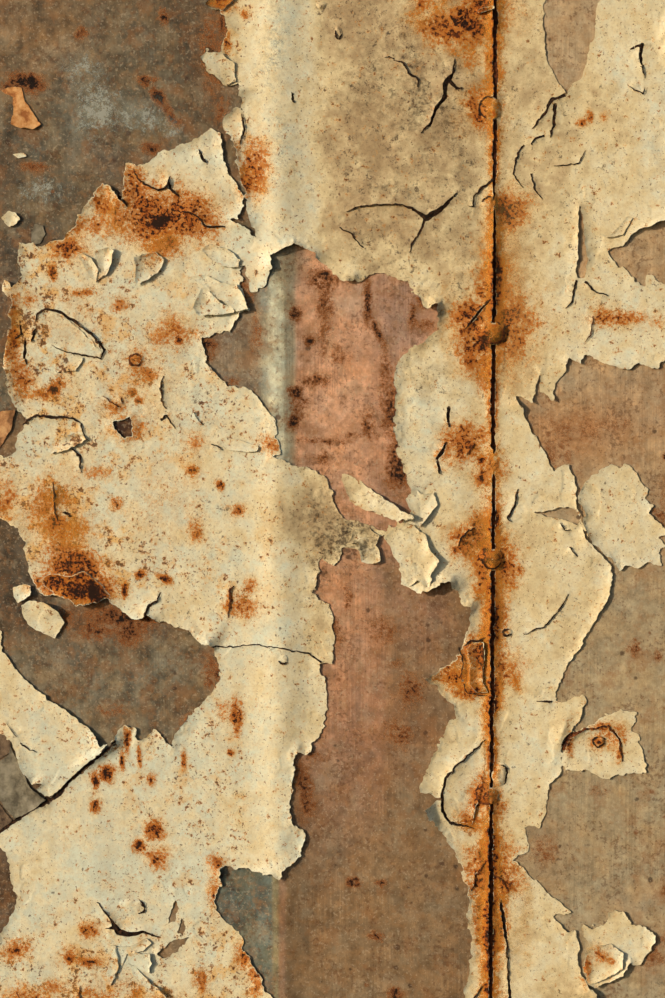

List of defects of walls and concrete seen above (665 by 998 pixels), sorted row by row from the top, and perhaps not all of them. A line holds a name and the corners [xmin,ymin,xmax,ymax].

crack [421,59,463,133]
peeling [543,0,600,96]
crack [339,94,566,252]
corrosion [47,164,224,282]
peeling [600,216,665,287]
corrosion [0,476,172,646]
peeling [513,355,665,998]
crack [0,740,116,833]
crack [97,902,159,937]
corrosion [206,852,228,907]
crack [471,861,512,998]
corrosion [2,977,158,998]